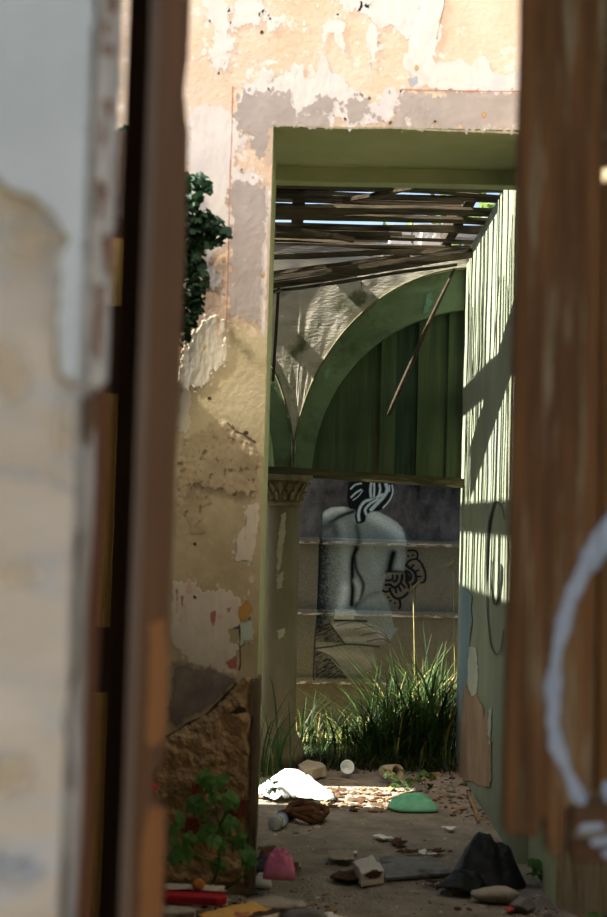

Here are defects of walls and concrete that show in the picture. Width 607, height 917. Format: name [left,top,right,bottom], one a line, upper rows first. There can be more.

spalling [154,0,518,888]